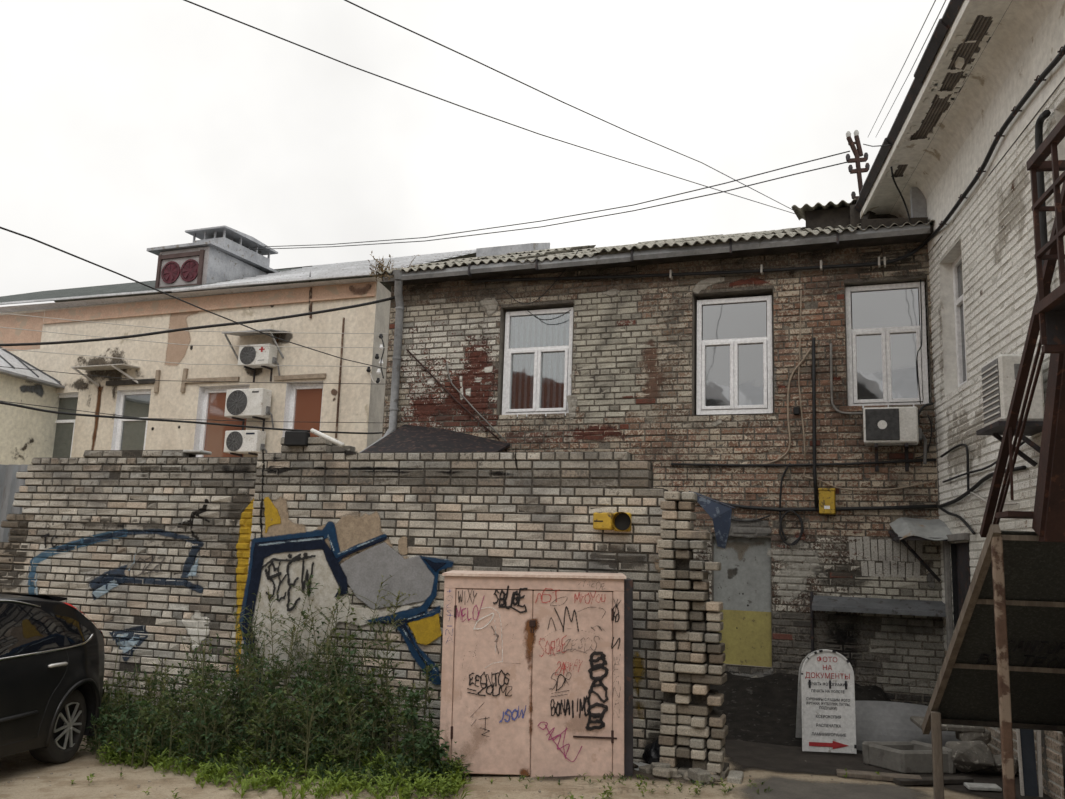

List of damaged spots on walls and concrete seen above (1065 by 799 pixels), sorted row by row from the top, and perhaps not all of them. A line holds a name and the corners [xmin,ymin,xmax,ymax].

flaking render [946,35,990,102]
peeling [165,312,197,366]
peeling [413,340,496,423]
flaking render [235,497,435,677]
rust [525,619,539,668]